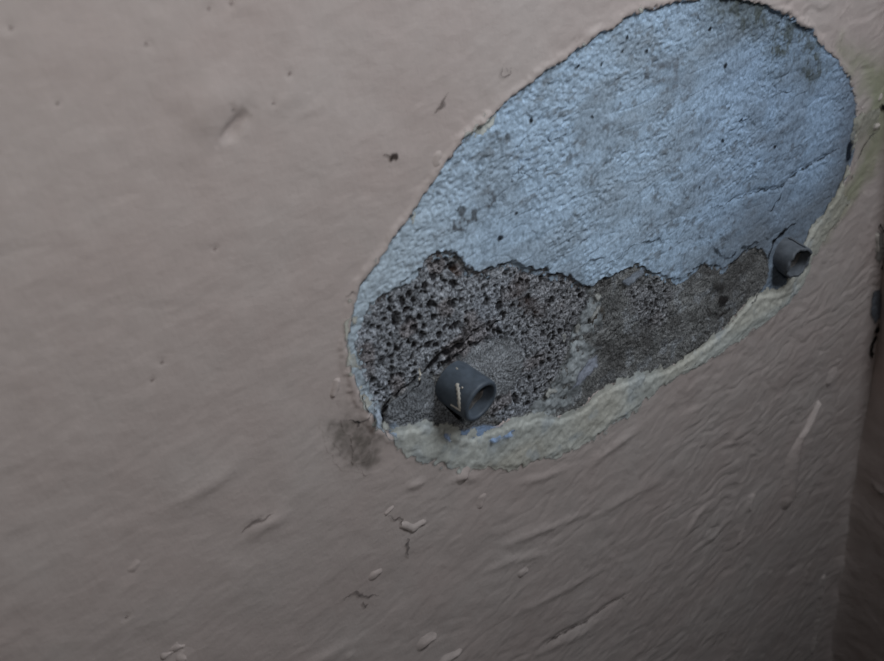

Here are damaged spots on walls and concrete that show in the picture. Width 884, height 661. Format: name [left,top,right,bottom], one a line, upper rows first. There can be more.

crack [712,133,874,211]
flaking render [344,0,884,474]
crack [629,223,796,259]
leakage [319,396,394,476]